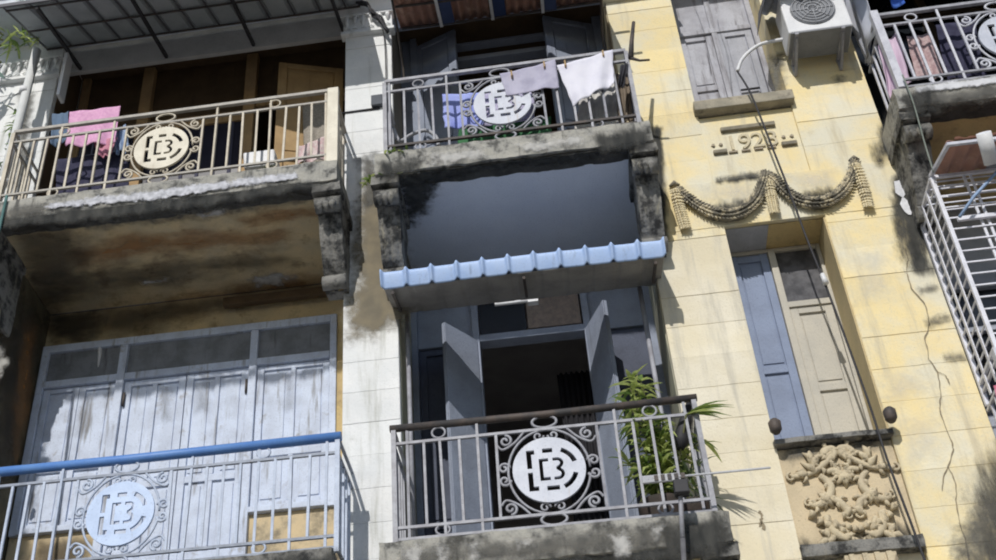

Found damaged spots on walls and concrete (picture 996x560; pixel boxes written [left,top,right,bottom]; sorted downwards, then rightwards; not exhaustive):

mould [874,119,888,166]
leakage [0,95,325,305]
leakage [346,126,668,338]
mould [893,176,933,273]
leakage [54,301,223,337]
crack [906,252,970,560]
leakage [274,552,340,560]
leakage [405,515,725,560]
leakage [956,459,996,560]